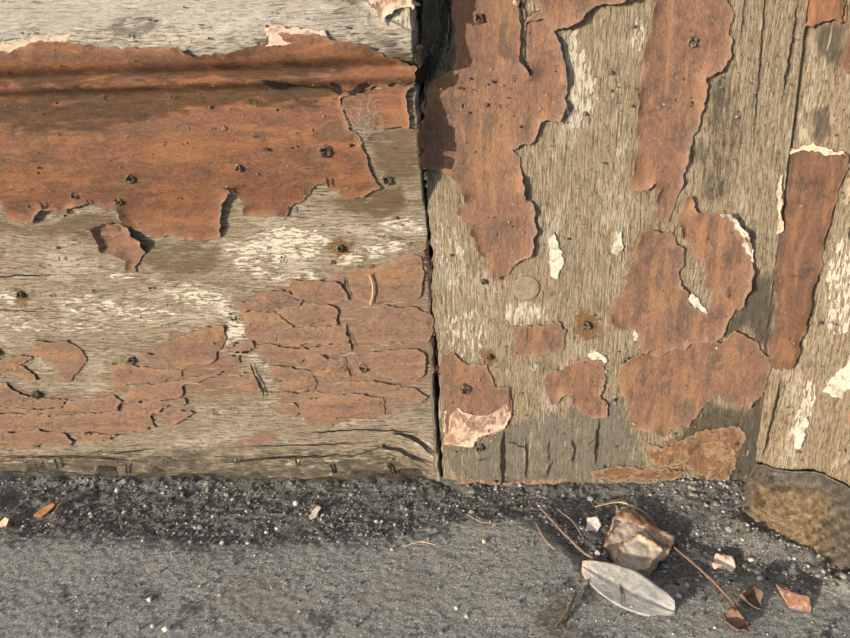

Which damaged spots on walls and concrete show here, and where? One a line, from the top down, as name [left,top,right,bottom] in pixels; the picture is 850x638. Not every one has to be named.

crack [413,1,451,87]
crack [519,0,540,76]
crack [740,0,765,161]
crack [779,2,798,104]
peeling [0,0,632,281]
peeling [590,0,850,482]
peeling [0,240,515,449]
peeling [508,319,566,357]
peeling [540,351,608,419]